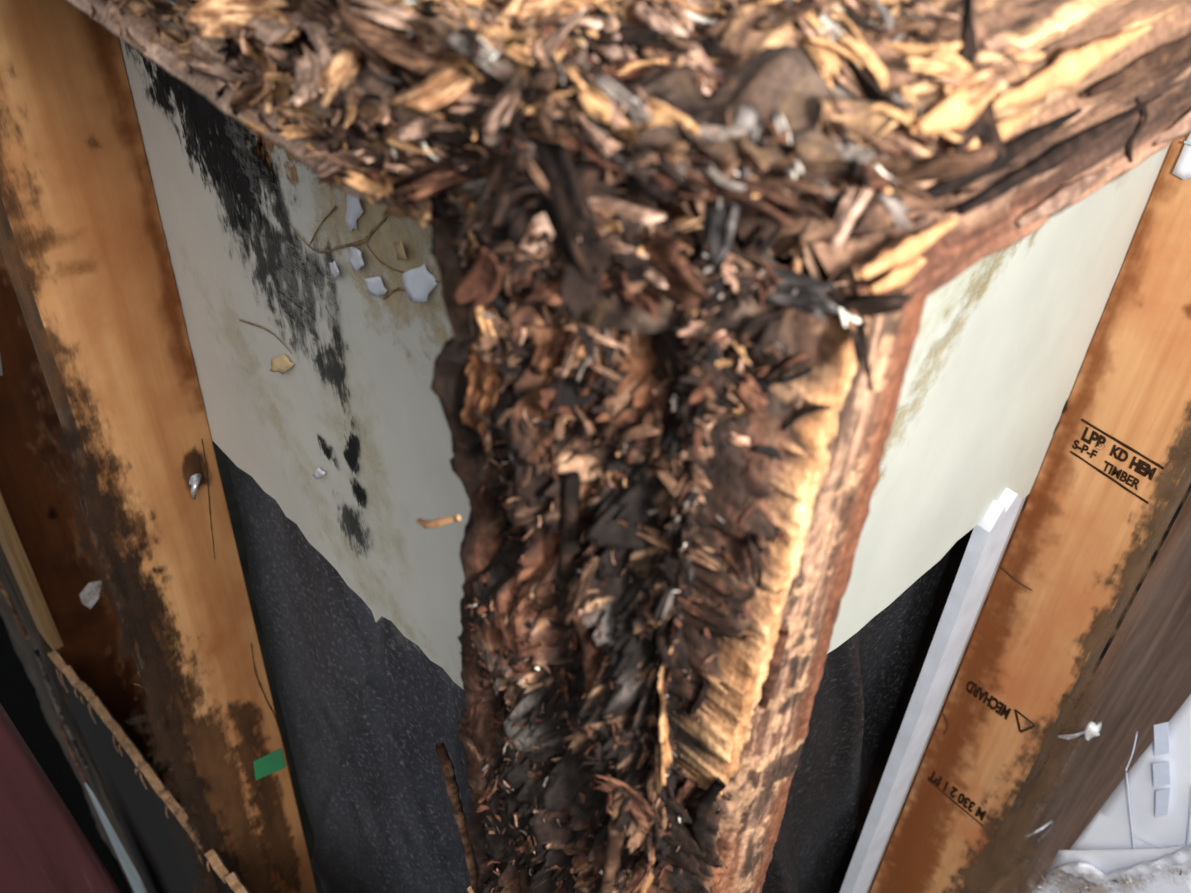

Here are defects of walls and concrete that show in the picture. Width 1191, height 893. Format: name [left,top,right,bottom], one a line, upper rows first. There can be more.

damp [84,13,447,556]
damp [0,156,301,893]
peeling [478,778,497,803]
peeling [492,676,507,738]
peeling [556,555,613,656]
peeling [590,714,699,893]
peeling [635,356,775,716]
damp [879,211,1151,893]
damp [943,405,1191,893]